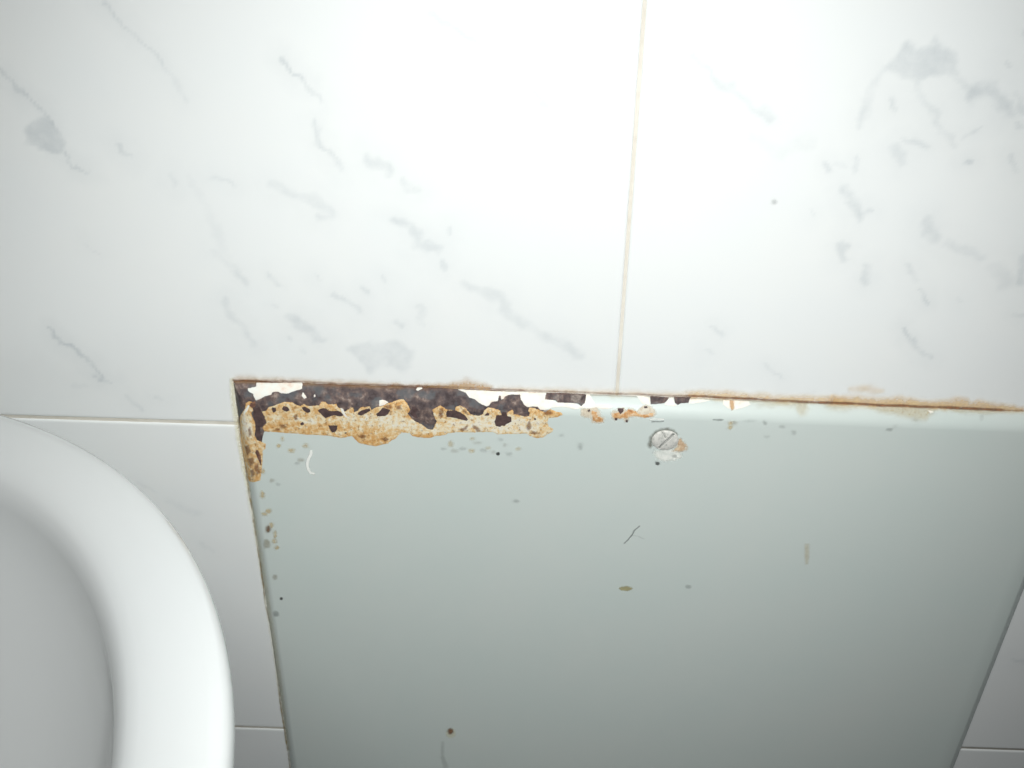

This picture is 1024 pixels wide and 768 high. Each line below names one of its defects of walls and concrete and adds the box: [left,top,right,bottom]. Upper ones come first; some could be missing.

peeling [546,393,612,409]
peeling [637,396,710,406]
rust [690,394,1021,413]
rust [233,380,655,549]